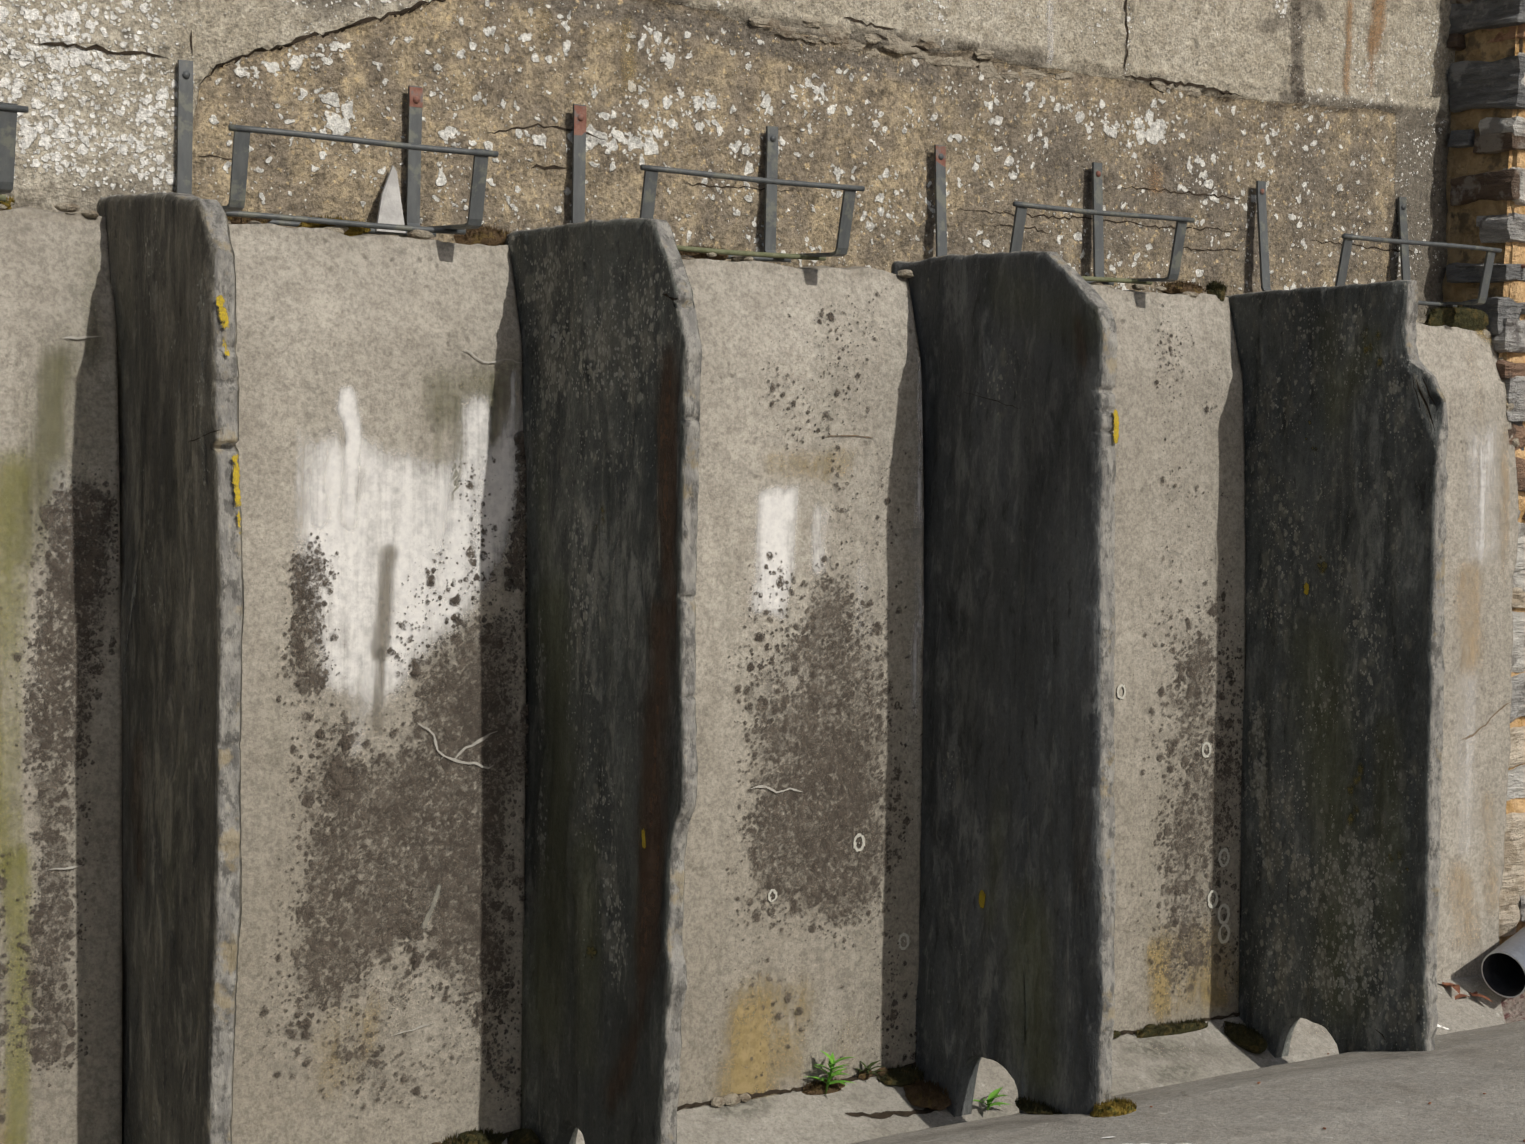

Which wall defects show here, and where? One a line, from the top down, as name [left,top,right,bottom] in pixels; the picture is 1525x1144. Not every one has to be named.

crack [33,30,193,59]
damp [0,356,137,1143]
damp [261,373,529,1129]
damp [716,288,923,1099]